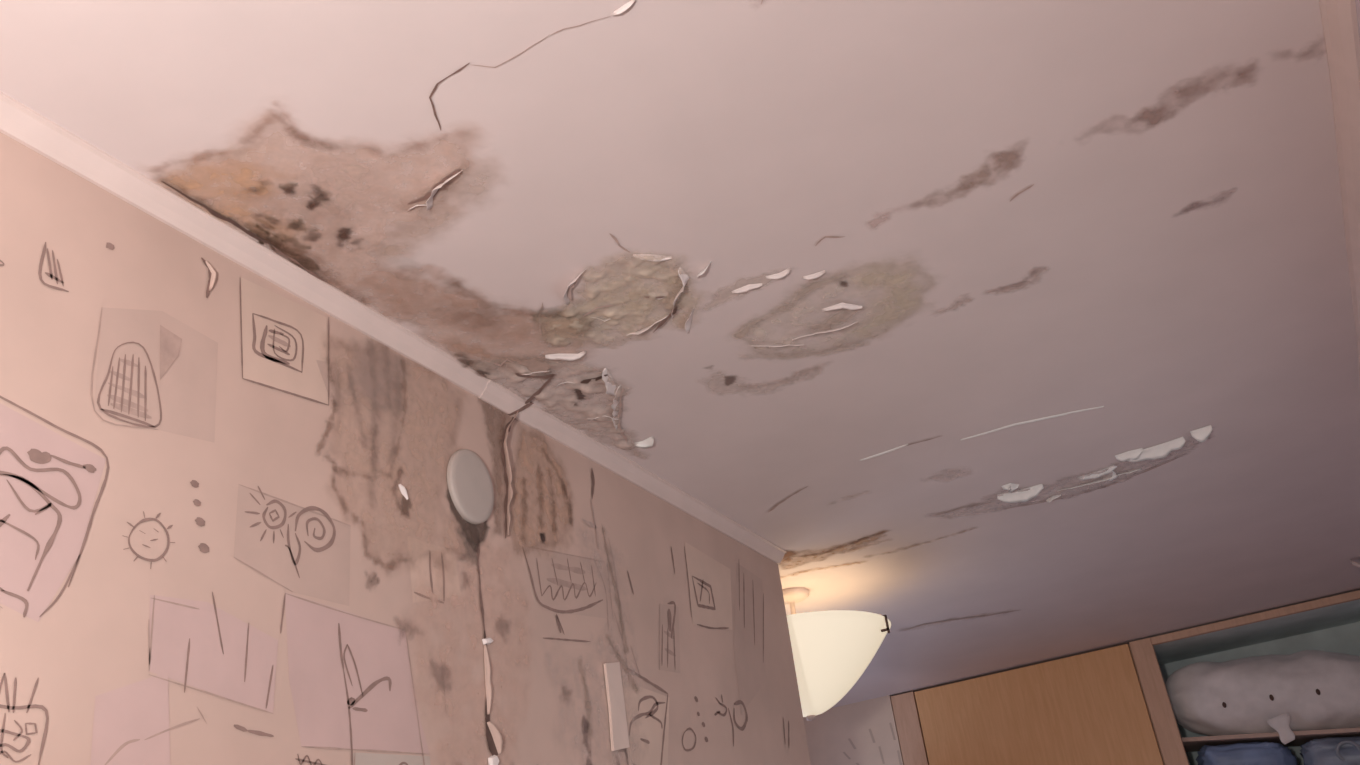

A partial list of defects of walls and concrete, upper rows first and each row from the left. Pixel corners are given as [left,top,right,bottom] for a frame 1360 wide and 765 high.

crack [429,0,635,130]
leakage [185,139,580,369]
peeling [407,169,463,211]
spalling [458,233,826,455]
leakage [333,445,431,518]
leakage [484,402,571,545]
peeling [934,425,1212,517]
crack [477,540,502,765]